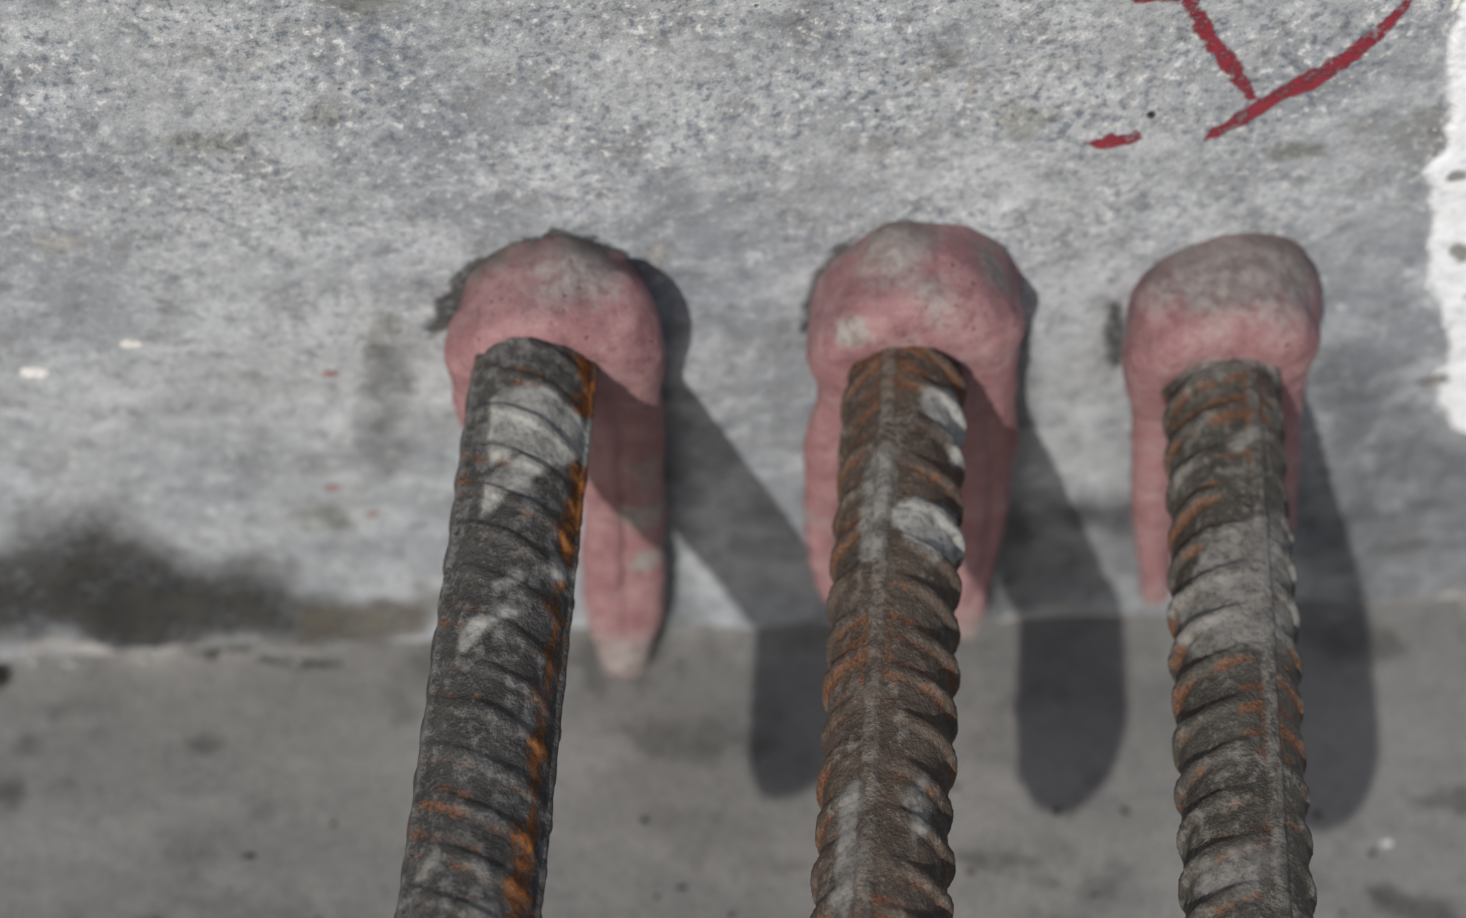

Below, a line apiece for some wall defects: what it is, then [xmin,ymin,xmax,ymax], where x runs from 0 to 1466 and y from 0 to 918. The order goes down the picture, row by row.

leakage [0,527,428,656]